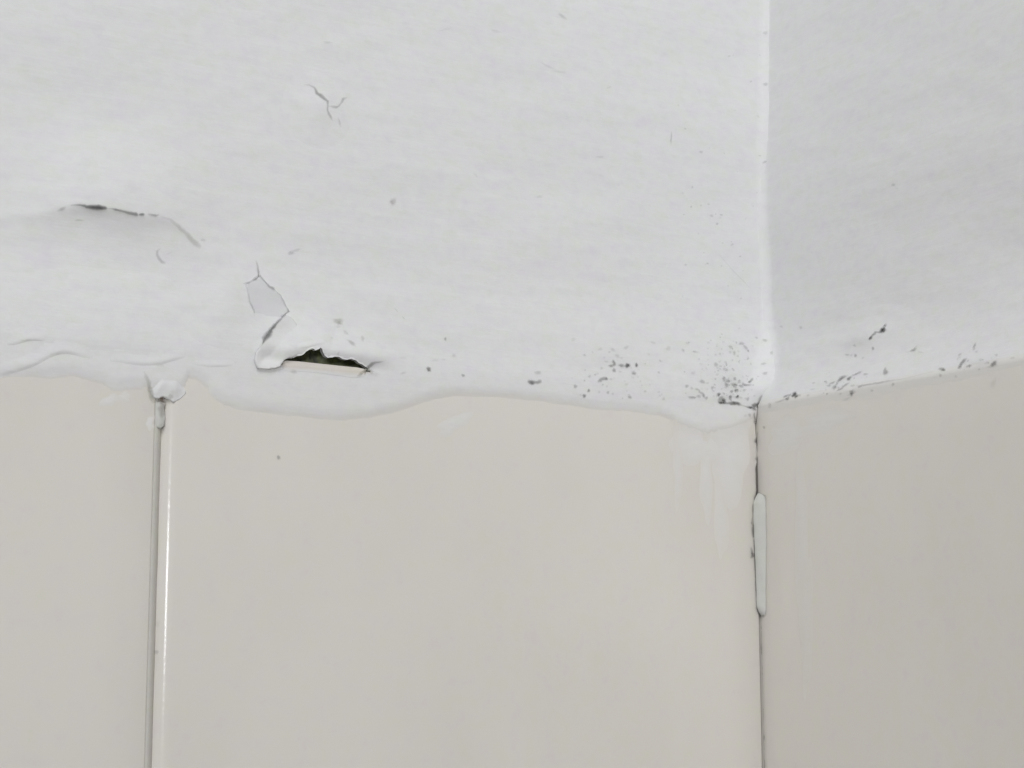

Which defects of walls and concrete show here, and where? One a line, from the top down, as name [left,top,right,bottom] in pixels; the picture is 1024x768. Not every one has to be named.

spalling [229,275,418,378]